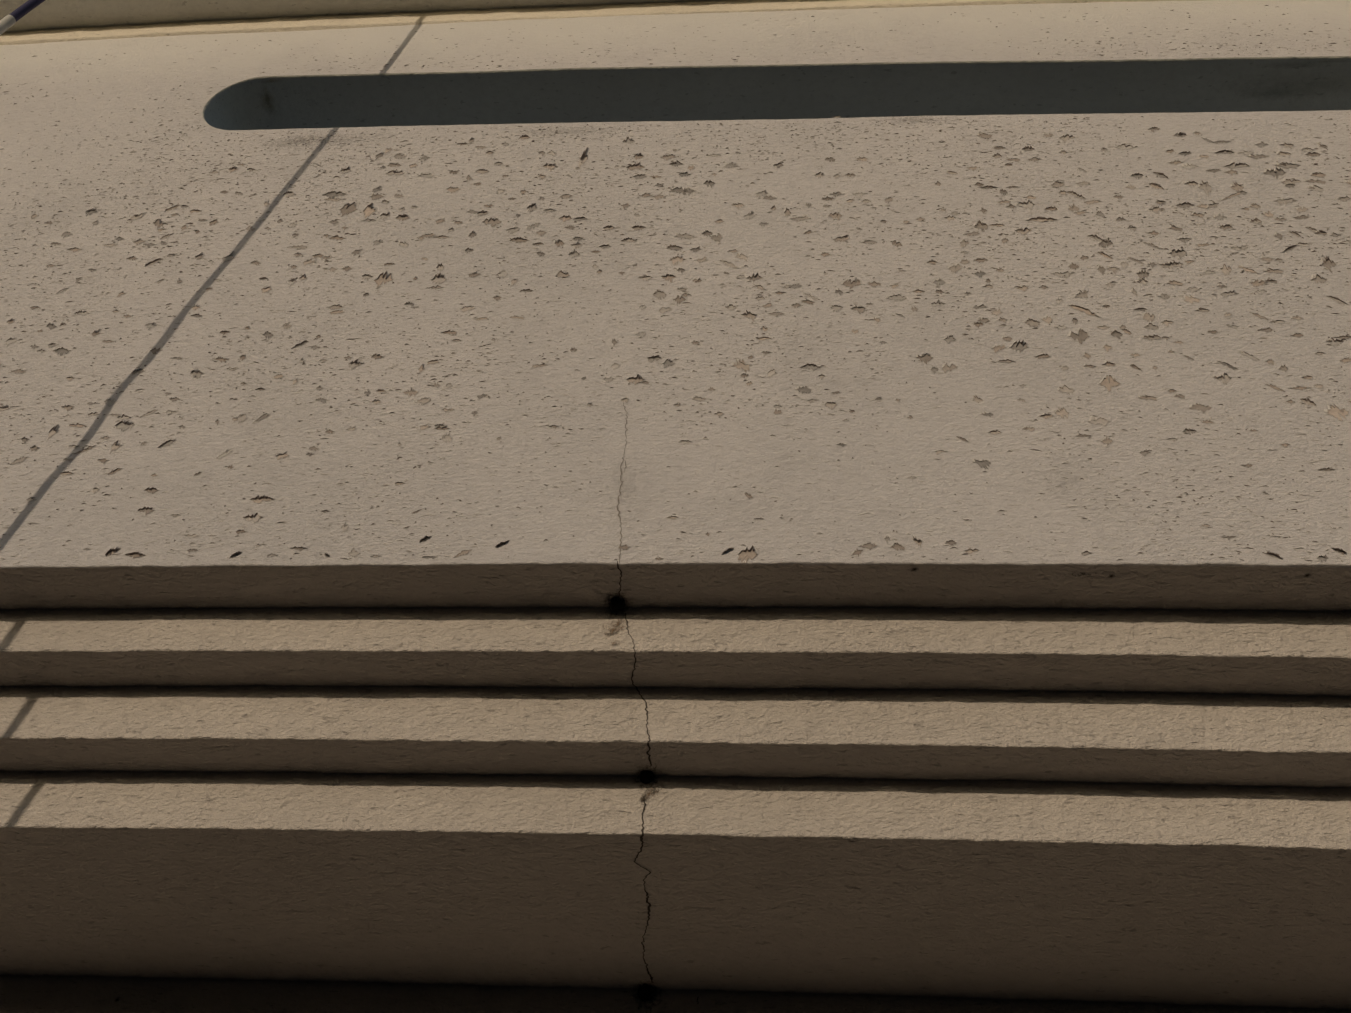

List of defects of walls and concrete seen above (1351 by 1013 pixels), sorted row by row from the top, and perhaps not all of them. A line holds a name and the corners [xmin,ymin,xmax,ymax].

crack [614,403,657,982]